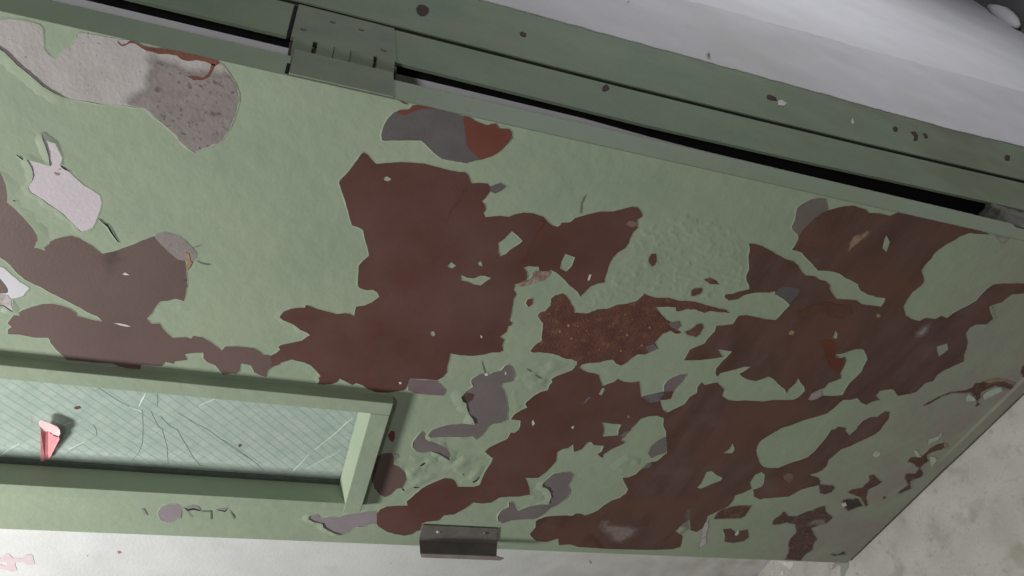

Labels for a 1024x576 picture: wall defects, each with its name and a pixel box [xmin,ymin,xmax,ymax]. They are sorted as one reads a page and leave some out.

peeling [0,17,241,153]
peeling [0,104,1024,560]
corrosion [529,278,730,367]
corrosion [921,363,1024,409]
corrosion [842,433,948,511]